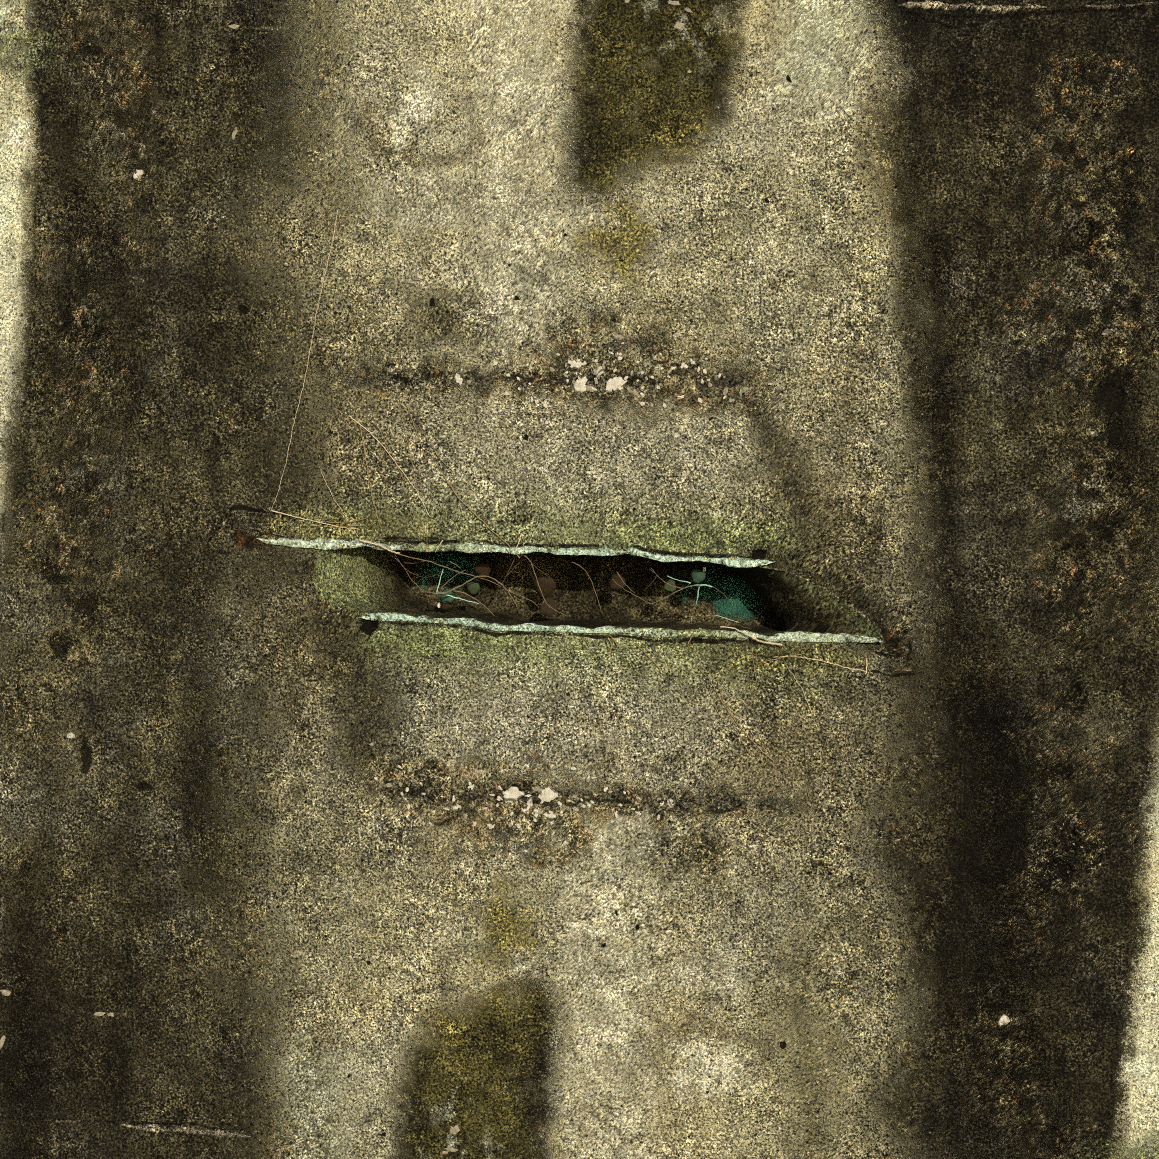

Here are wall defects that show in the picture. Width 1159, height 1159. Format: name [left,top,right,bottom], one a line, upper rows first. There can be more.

damp [0,0,617,1159]
crack [379,621,760,646]
crack [375,536,777,558]
damp [740,397,829,547]
crack [870,642,915,677]
damp [760,0,1159,1159]